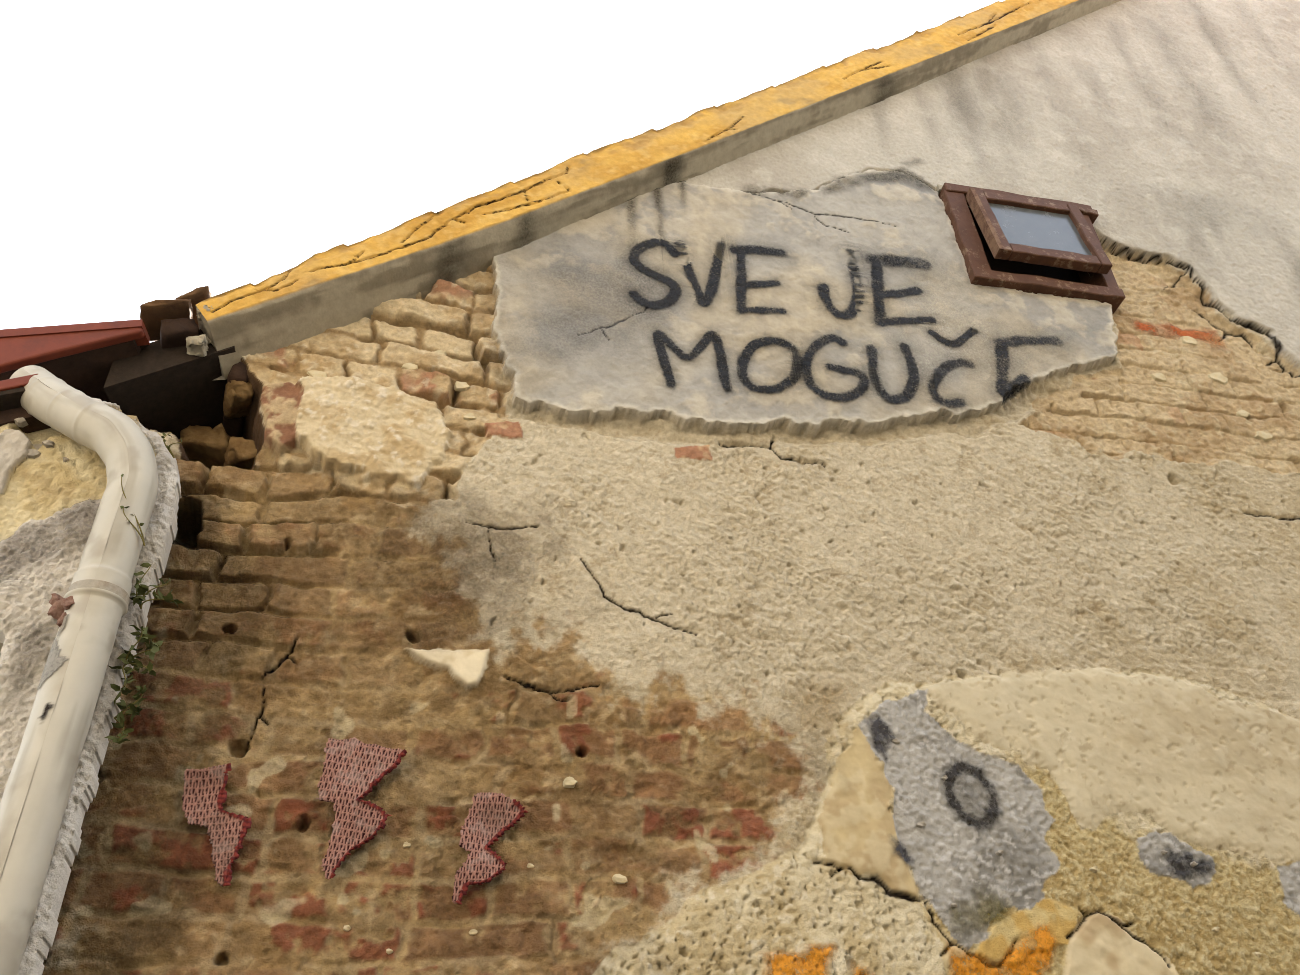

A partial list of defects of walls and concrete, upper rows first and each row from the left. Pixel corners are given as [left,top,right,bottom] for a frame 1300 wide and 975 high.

crack [963,3,1029,41]
crack [325,167,569,269]
crack [752,194,896,232]
crack [213,271,296,313]
spalling [1019,235,1300,475]
spalling [0,417,107,542]
peeling [37,615,68,689]
spalling [42,258,807,975]
crack [580,558,697,636]
peeling [818,666,1300,975]